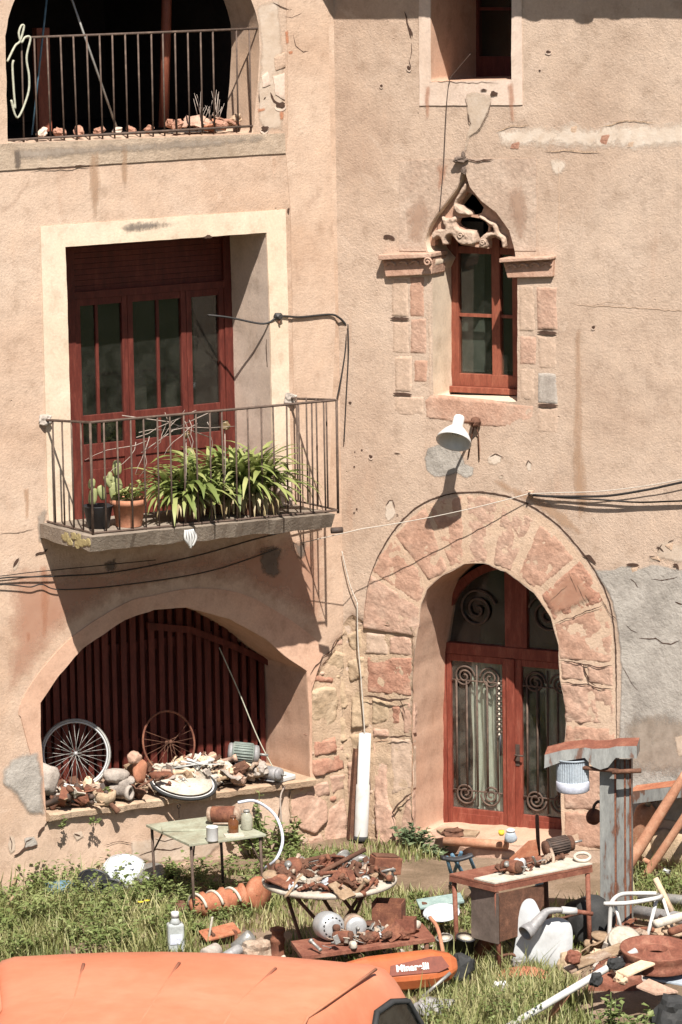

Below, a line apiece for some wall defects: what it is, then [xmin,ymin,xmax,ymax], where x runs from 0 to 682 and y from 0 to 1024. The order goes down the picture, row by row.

spalling [258,2,307,134]
crack [404,12,492,83]
flaking render [498,120,682,174]
spalling [425,445,473,477]
spalling [385,500,398,521]
spalling [547,539,682,787]
spalling [633,798,682,822]